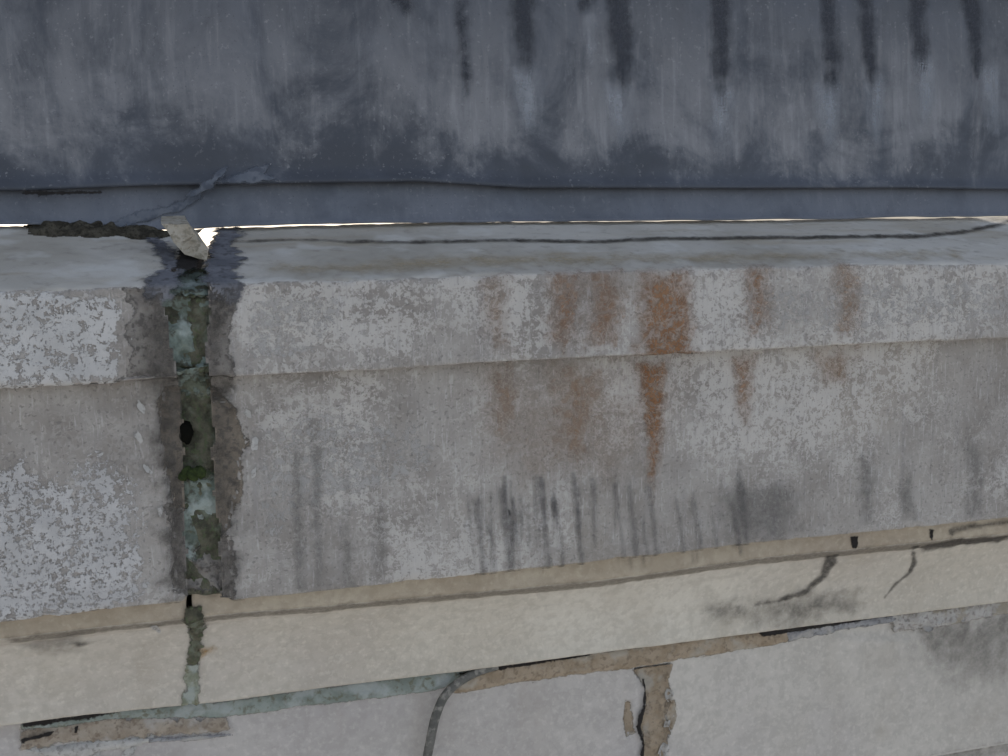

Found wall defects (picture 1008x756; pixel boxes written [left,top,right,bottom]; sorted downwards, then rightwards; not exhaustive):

damp [515,0,534,124]
damp [608,0,631,121]
damp [713,0,728,76]
damp [860,0,881,127]
damp [965,0,997,114]
corrosion [641,275,691,474]
crack [766,536,858,610]
crack [889,522,1008,592]
crack [181,606,207,706]
peeling [26,735,154,756]